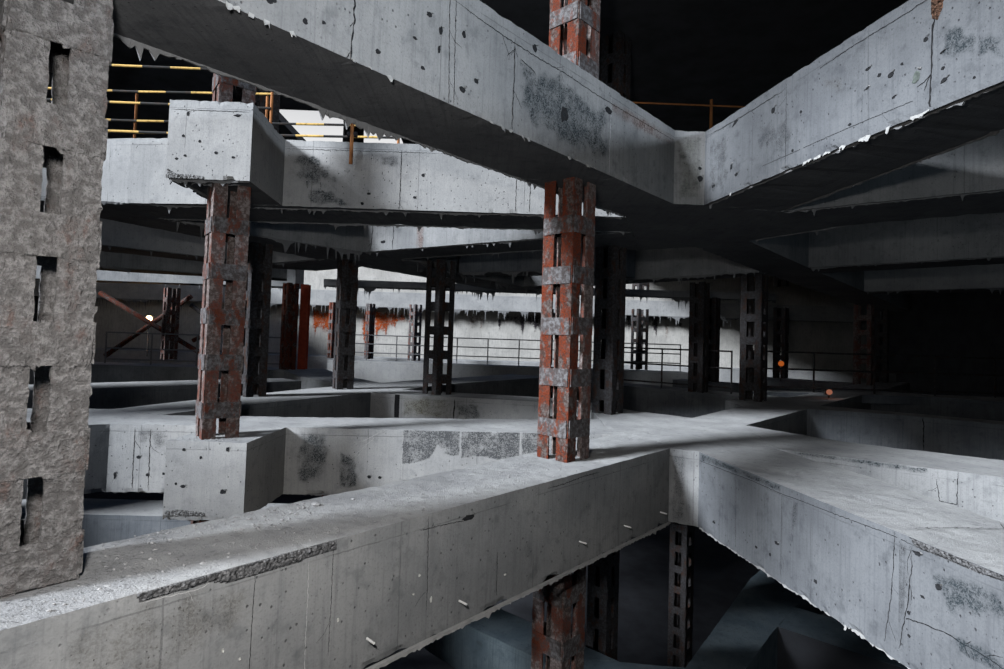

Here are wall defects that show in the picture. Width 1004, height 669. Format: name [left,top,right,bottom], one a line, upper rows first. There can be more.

spalling [931,0,944,20]
crack [347,0,356,58]
water stain [944,28,998,54]
crack [763,0,935,166]
water stain [524,70,606,156]
rust [313,310,329,331]
rust [362,311,405,339]
peeling [402,430,537,463]
crack [701,461,1004,669]
water stain [938,579,1003,612]